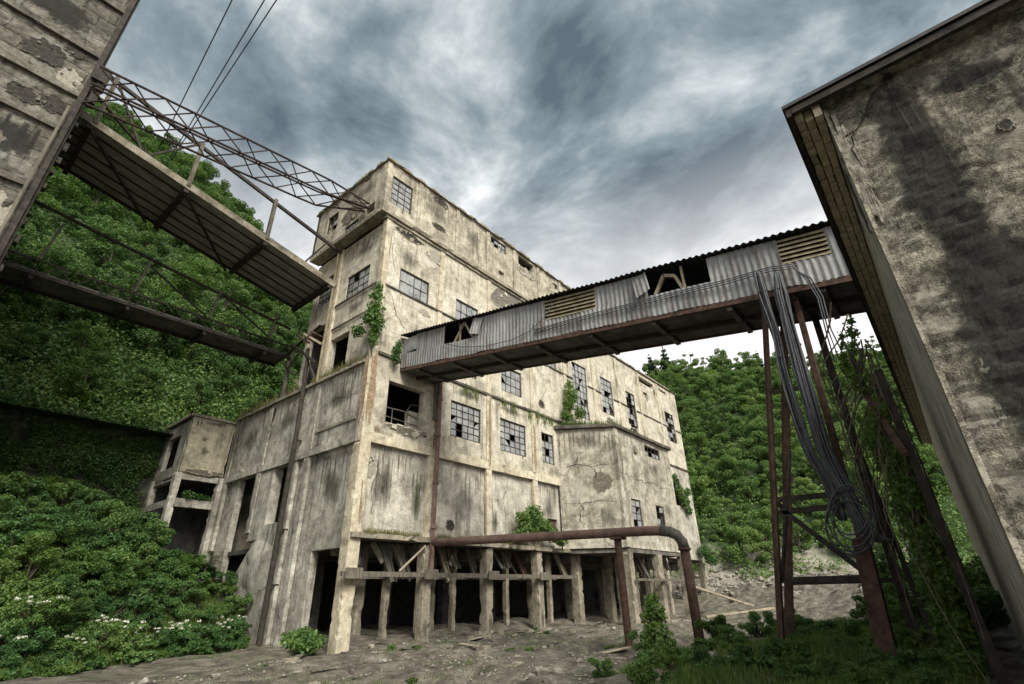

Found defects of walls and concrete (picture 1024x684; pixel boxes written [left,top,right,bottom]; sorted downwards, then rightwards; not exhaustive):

spalling [3,80,67,115]
spalling [19,35,87,90]
crack [832,72,897,168]
spalling [995,118,1017,134]
leakage [871,77,1024,435]
crack [566,453,605,526]
spalling [593,471,613,492]
rust [431,525,705,648]